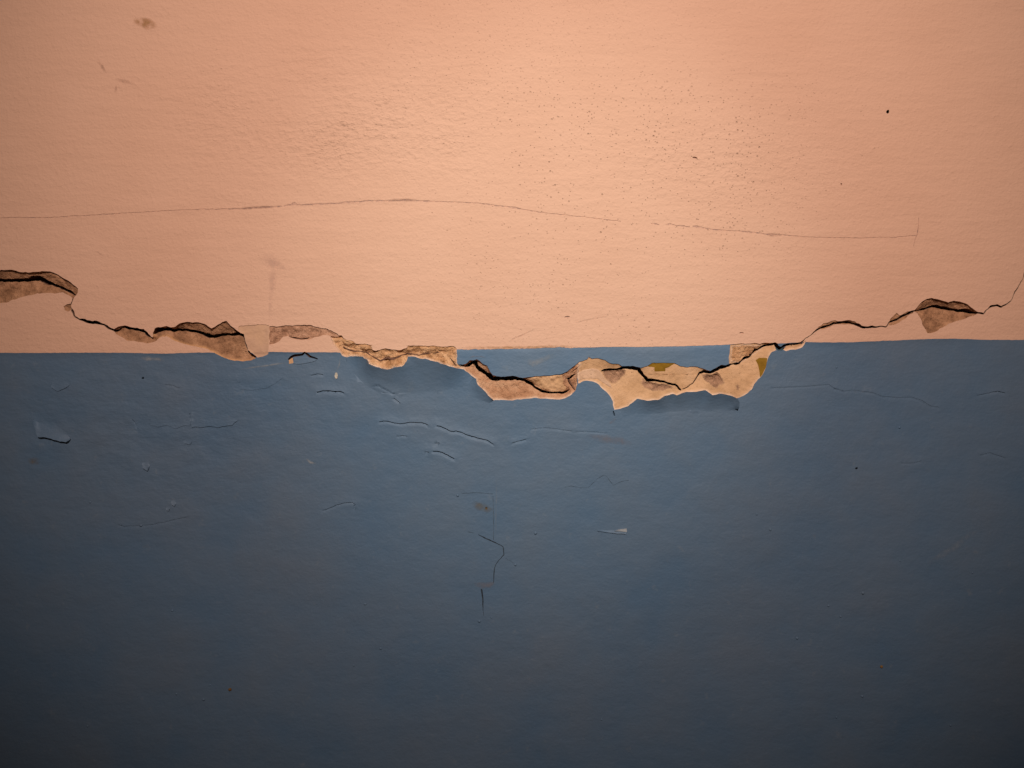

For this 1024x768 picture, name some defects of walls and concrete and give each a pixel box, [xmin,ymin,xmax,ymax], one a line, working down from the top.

crack [8,199,621,222]
crack [651,218,919,247]
spalling [0,270,78,311]
crack [0,276,254,355]
crack [601,274,1024,391]
spalling [888,298,976,333]
crack [344,347,575,394]
spalling [115,321,806,415]
crack [380,421,526,460]
crack [462,492,513,616]